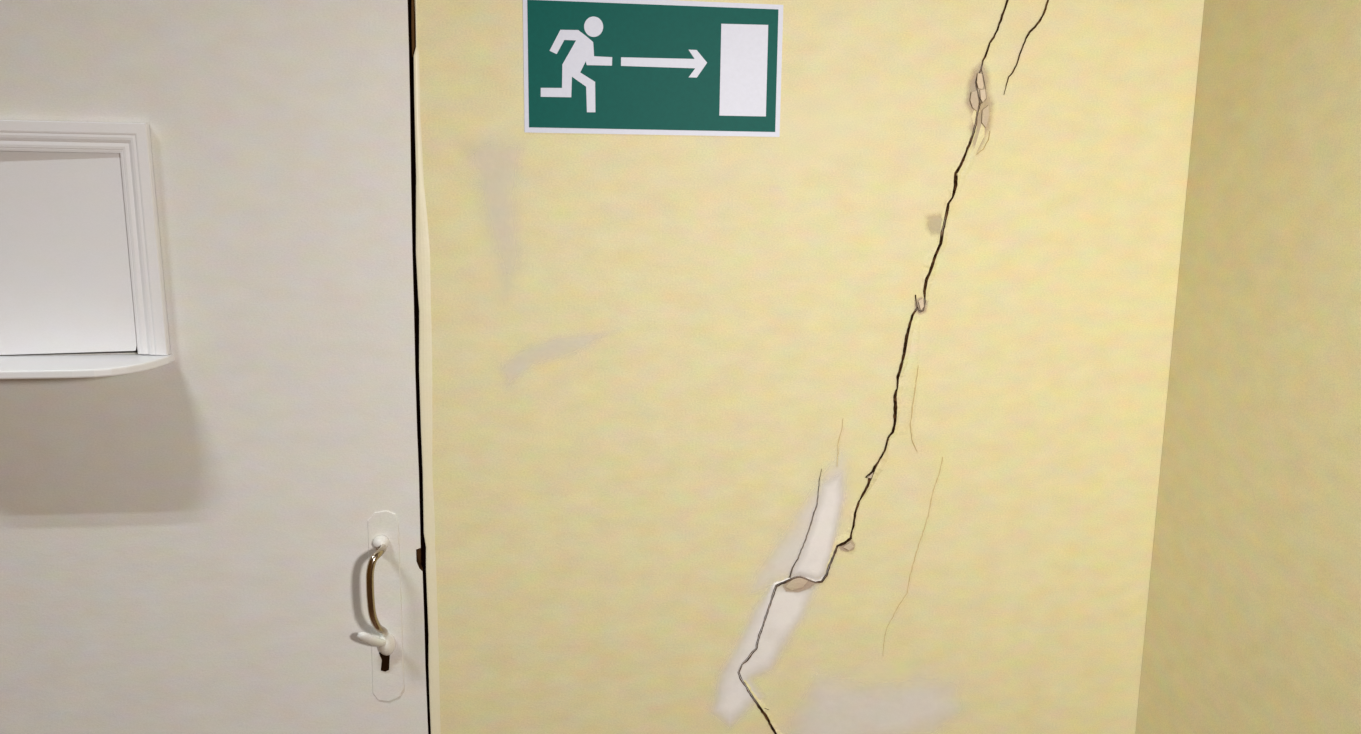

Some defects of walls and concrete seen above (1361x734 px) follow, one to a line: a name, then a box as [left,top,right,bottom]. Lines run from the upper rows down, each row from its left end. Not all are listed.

spalling [968,66,992,145]
crack [738,0,1049,734]
spalling [784,576,817,592]